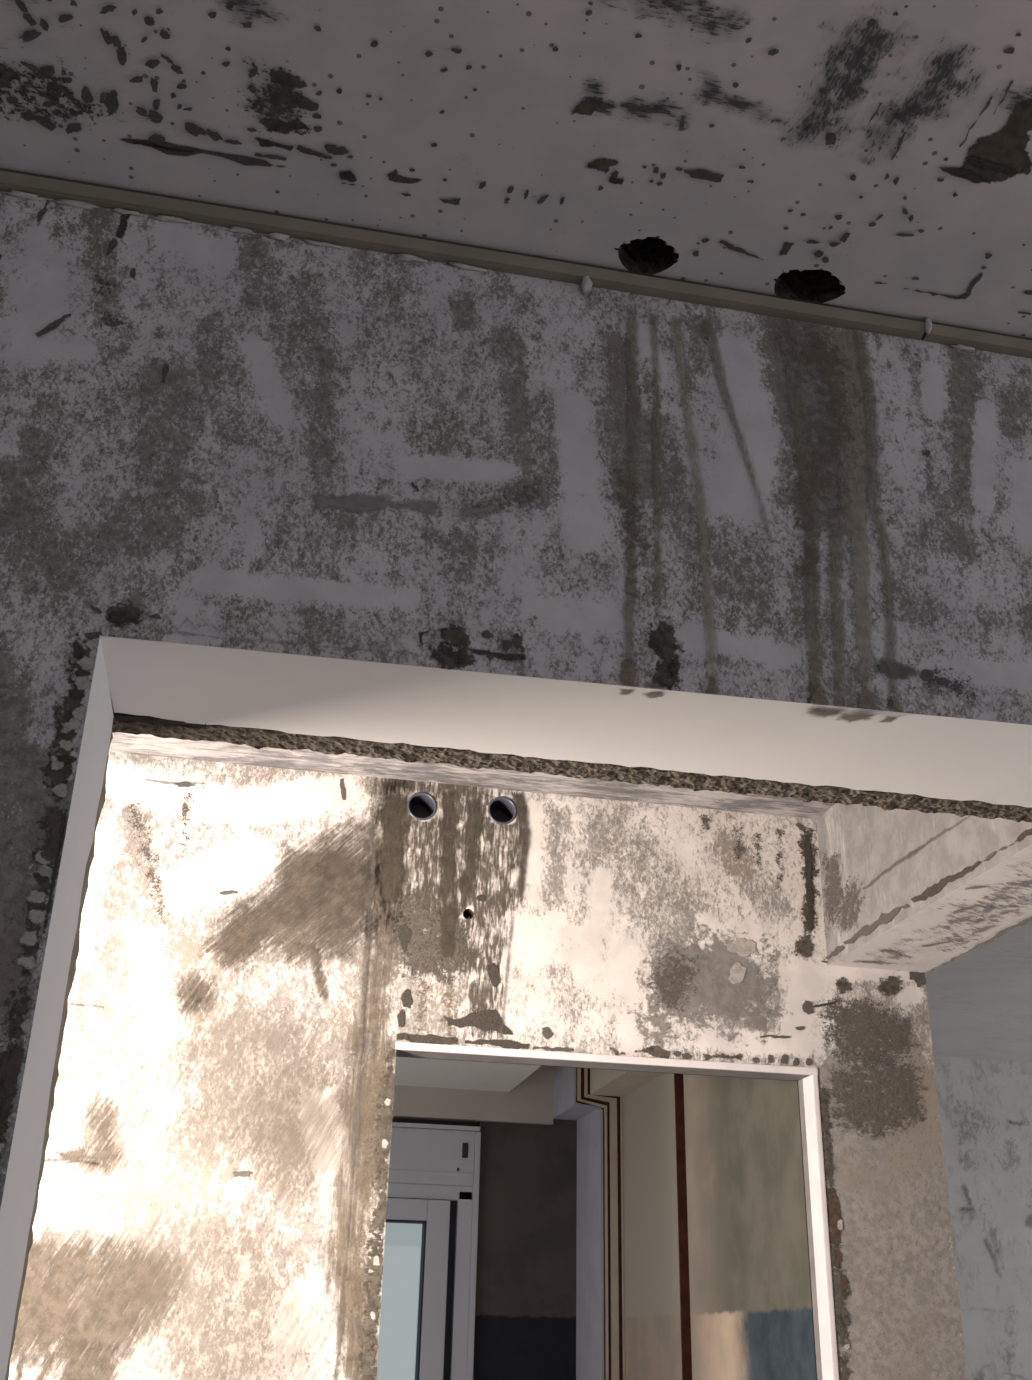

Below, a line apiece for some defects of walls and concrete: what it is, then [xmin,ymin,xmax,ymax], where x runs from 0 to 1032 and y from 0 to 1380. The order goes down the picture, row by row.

peeling [0,0,364,187]
peeling [642,165,754,186]
peeling [937,80,1032,197]
damp [604,312,719,698]
damp [704,320,984,722]
flaking render [418,616,537,670]
flaking render [645,617,685,690]
spalling [0,598,161,1159]
damp [60,1098,121,1171]
damp [176,778,530,1380]
spalling [5,694,1032,1380]
damp [11,1231,182,1380]